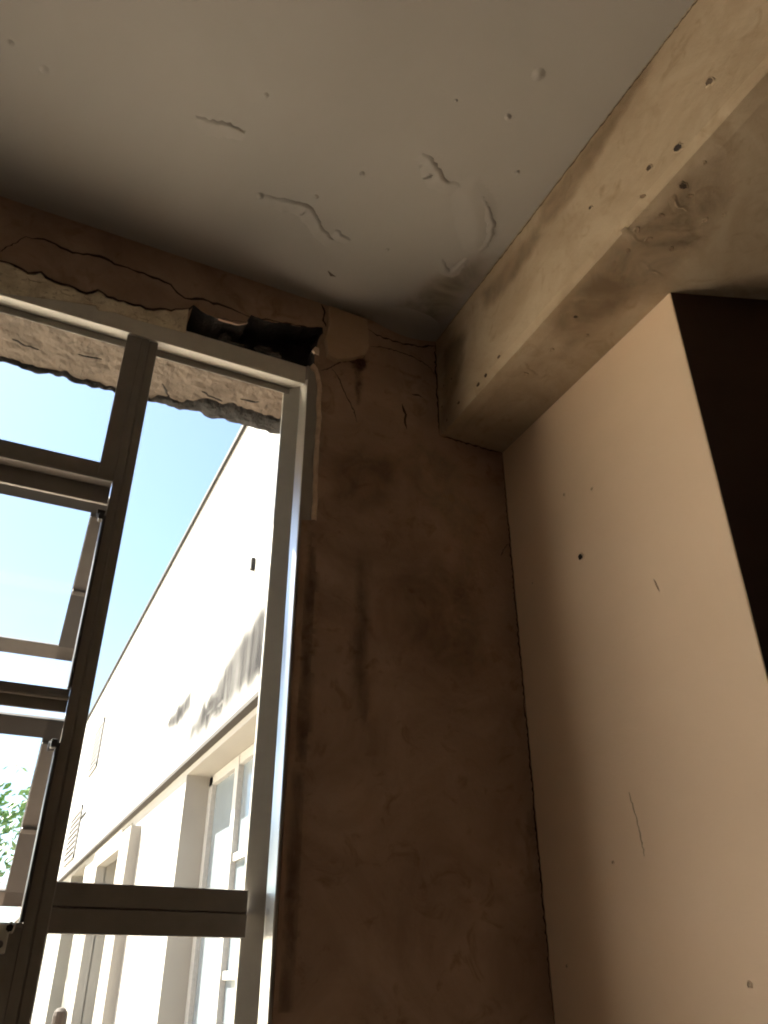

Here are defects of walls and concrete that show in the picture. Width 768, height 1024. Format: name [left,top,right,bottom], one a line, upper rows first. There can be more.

flaking render [0,260,323,520]
crack [0,236,326,329]
crack [323,0,698,1023]